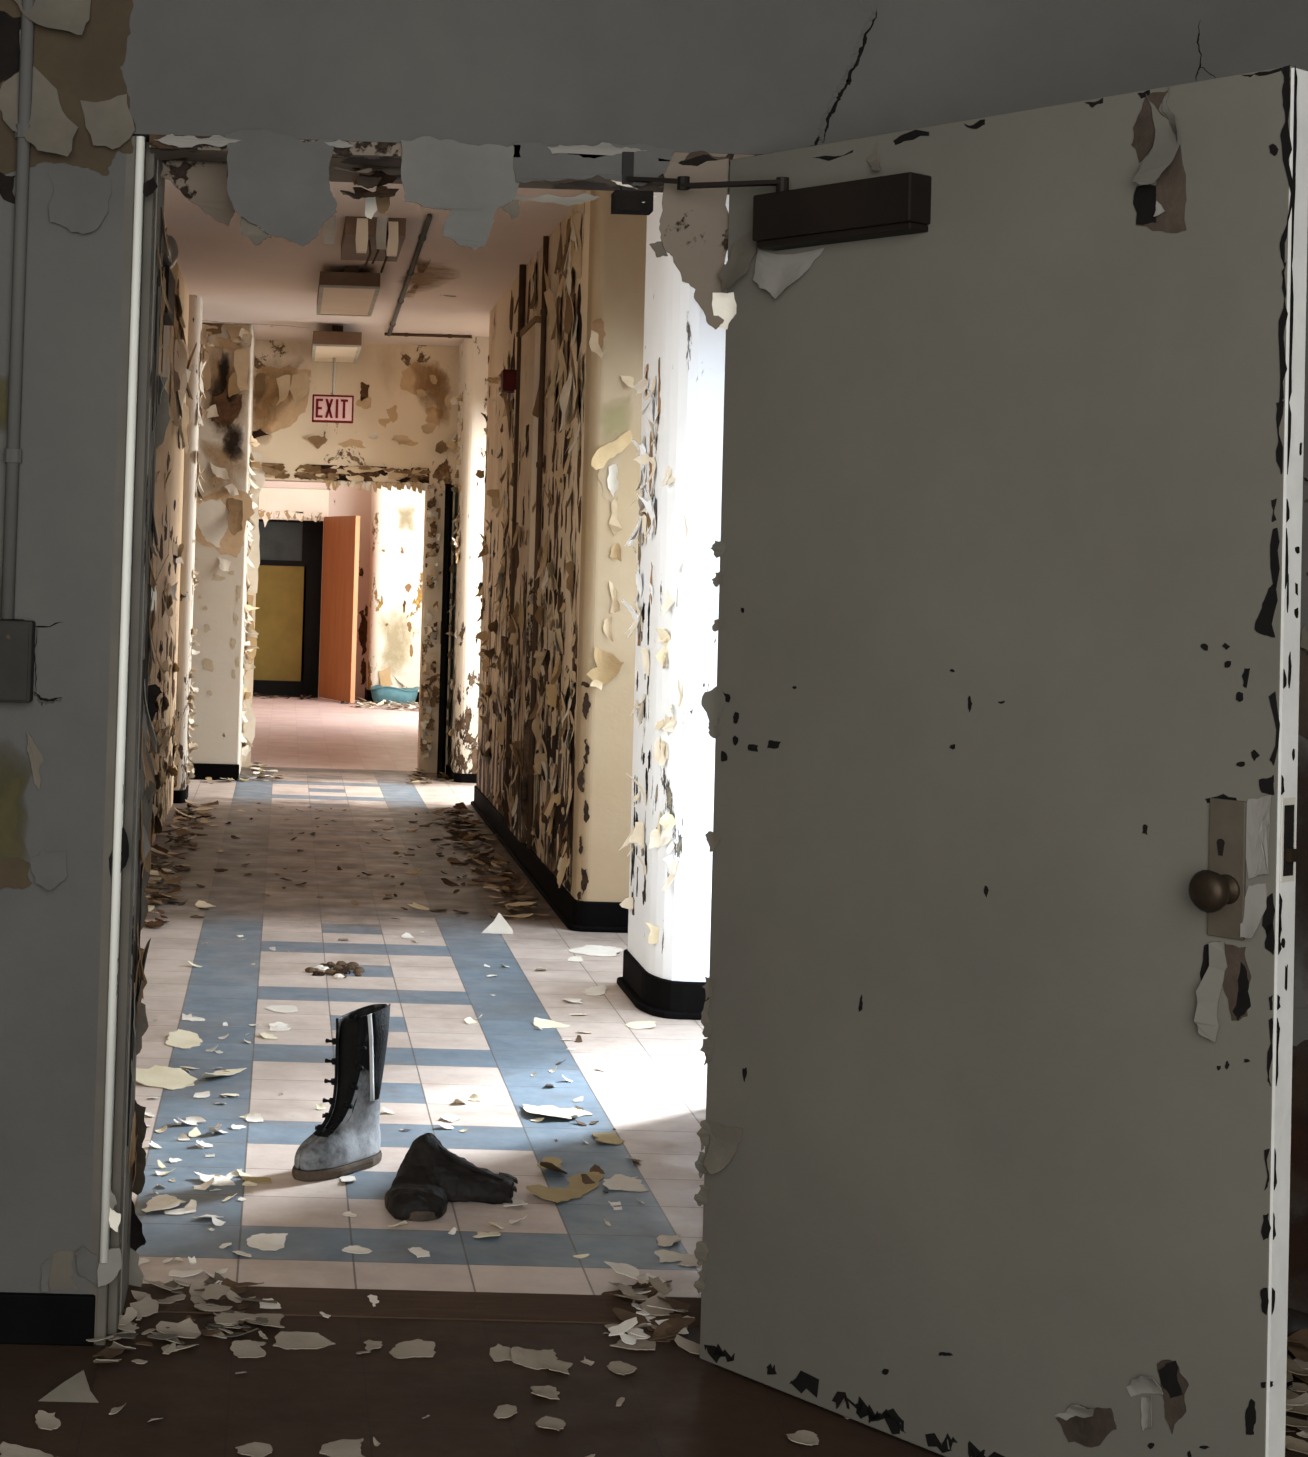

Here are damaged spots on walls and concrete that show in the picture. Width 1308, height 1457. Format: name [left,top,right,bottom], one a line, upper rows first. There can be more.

peeling [0,0,136,204]
crack [808,6,877,147]
flaking render [332,166,399,219]
peeling [1131,86,1187,233]
water stain [419,368,447,420]
peeling [710,538,726,587]
peeling [41,174,684,1292]
peeling [701,686,781,762]
peeling [700,975,715,1066]
peeling [766,1364,906,1435]
peeling [1055,1405,1117,1448]
peeling [1126,1359,1189,1449]